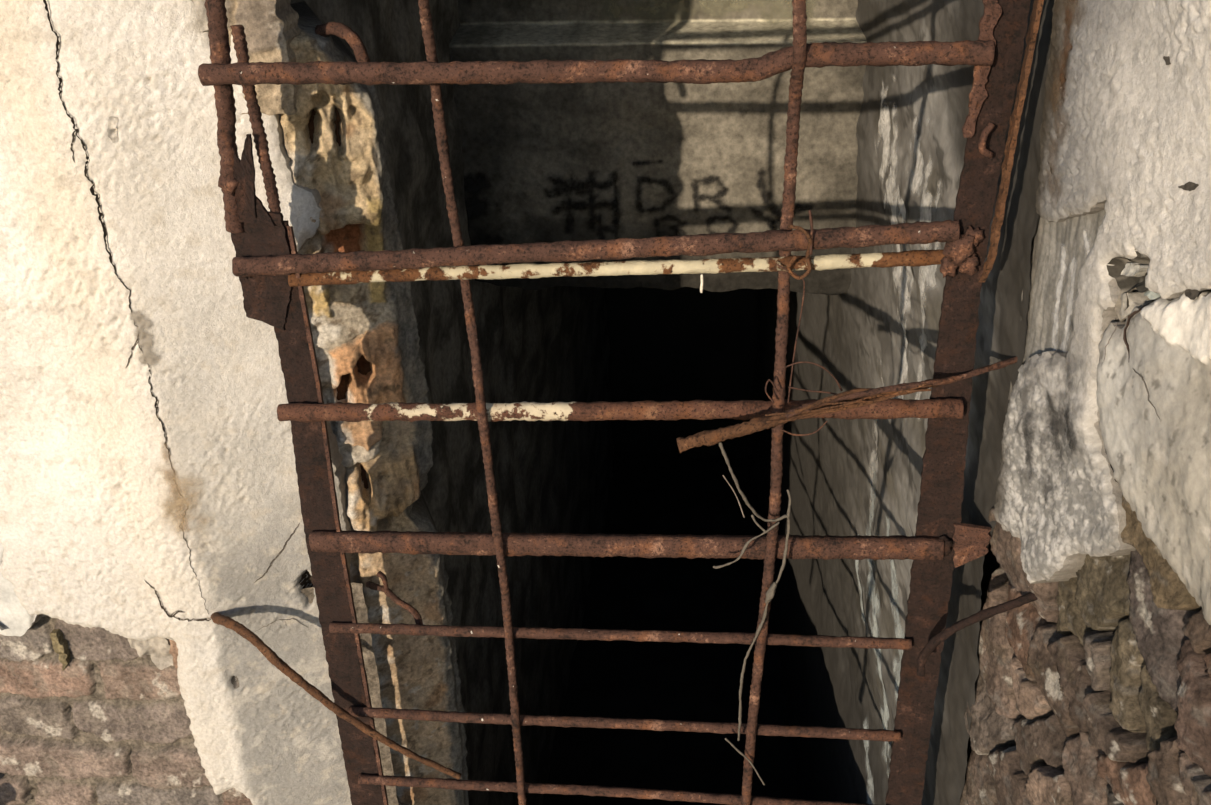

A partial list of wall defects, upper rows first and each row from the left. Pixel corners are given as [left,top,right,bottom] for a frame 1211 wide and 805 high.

spalling [191,0,209,32]
spalling [225,0,301,63]
spalling [242,84,316,144]
crack [43,0,211,622]
spalling [1107,249,1161,322]
spalling [1184,289,1200,300]
spalling [336,355,371,400]
spalling [360,464,369,489]
spalling [299,570,315,604]
spalling [0,542,253,805]
spalling [351,583,399,805]